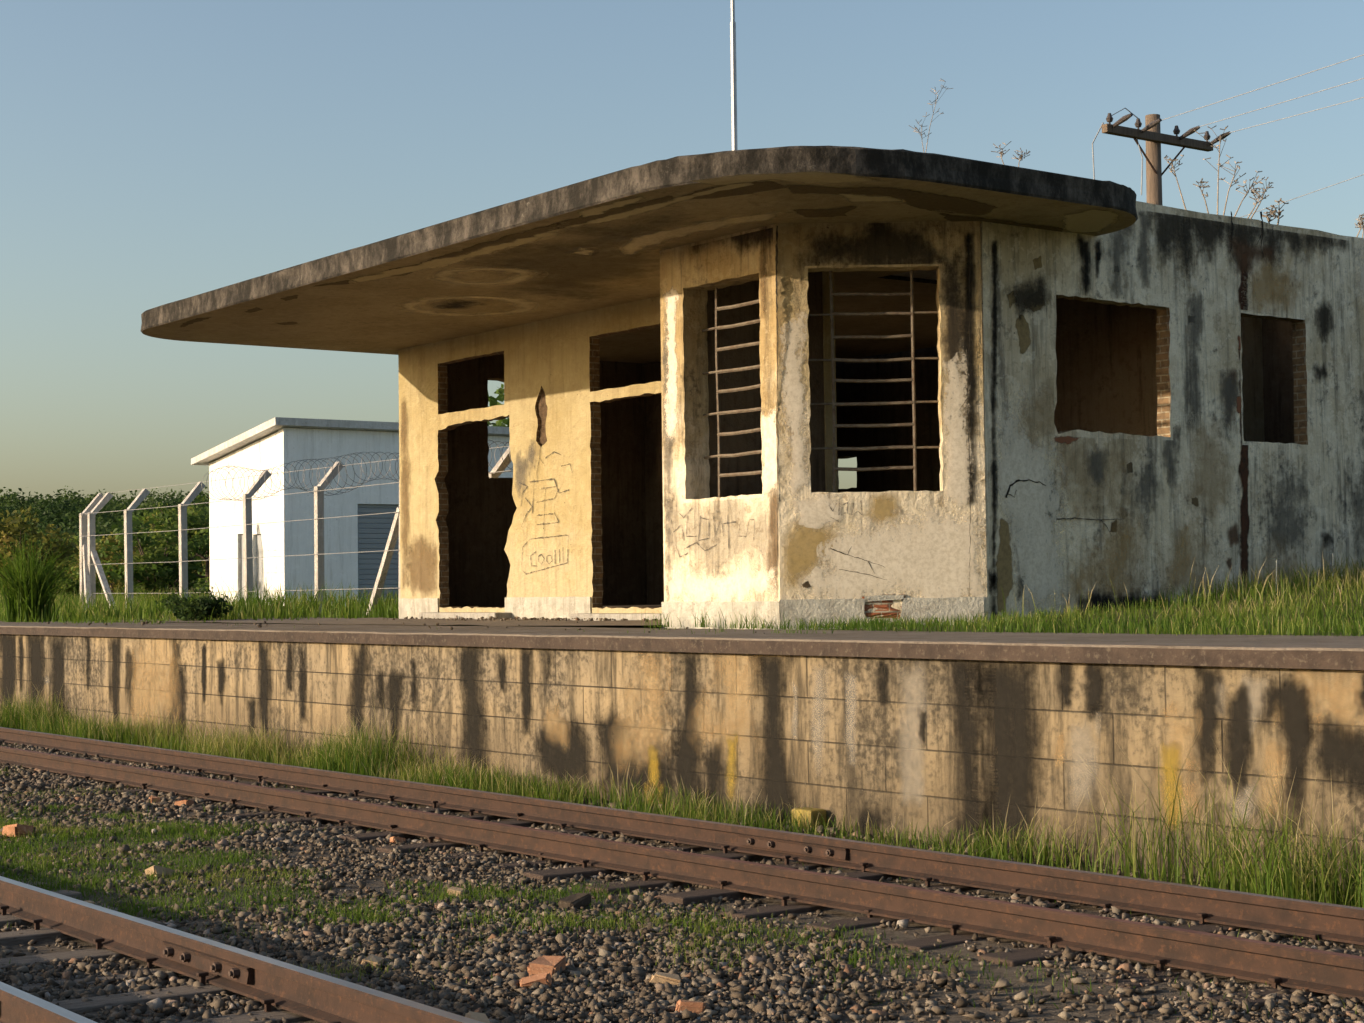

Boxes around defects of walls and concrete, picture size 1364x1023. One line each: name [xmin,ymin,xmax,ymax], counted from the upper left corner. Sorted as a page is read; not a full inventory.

spalling [538,390,548,446]
peeling [664,287,679,436]
peeling [667,552,776,602]
peeling [761,312,1078,619]
leakage [803,223,1050,618]
crack [959,239,971,590]
crack [1005,479,1046,498]
crack [1056,517,1114,536]
corrosion [1225,350,1250,594]
leakage [0,634,65,717]
leakage [248,642,306,738]
leakage [1195,667,1364,812]